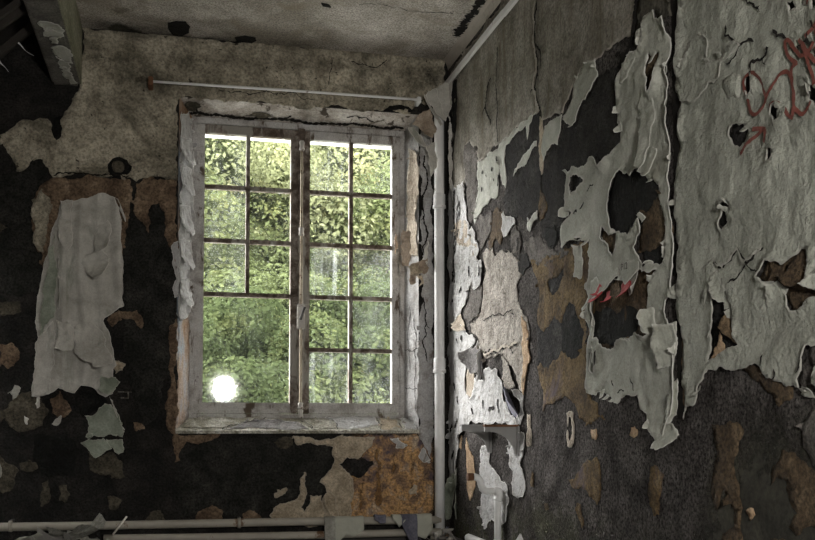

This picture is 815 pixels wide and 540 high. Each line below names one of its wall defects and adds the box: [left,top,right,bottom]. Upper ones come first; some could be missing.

peeling [0,21,445,519]
peeling [477,432,525,529]
peeling [445,0,815,483]
crack [712,246,763,283]